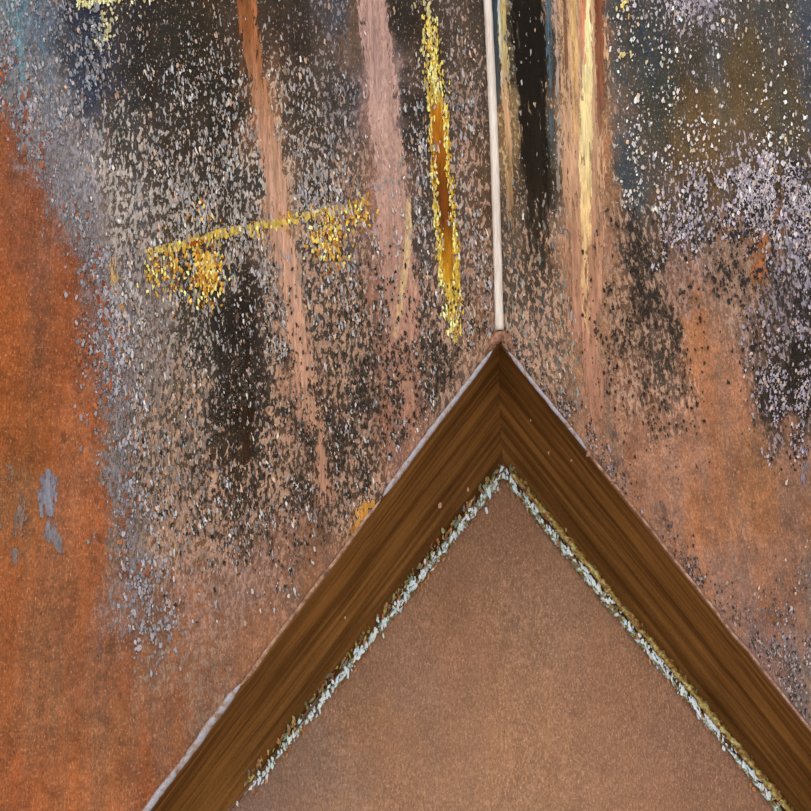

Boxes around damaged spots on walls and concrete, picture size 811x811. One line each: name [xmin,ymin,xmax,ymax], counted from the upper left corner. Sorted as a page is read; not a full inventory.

corrosion [0,41,90,225]
corrosion [45,230,150,576]
peeling [0,0,493,678]
peeling [662,515,811,719]